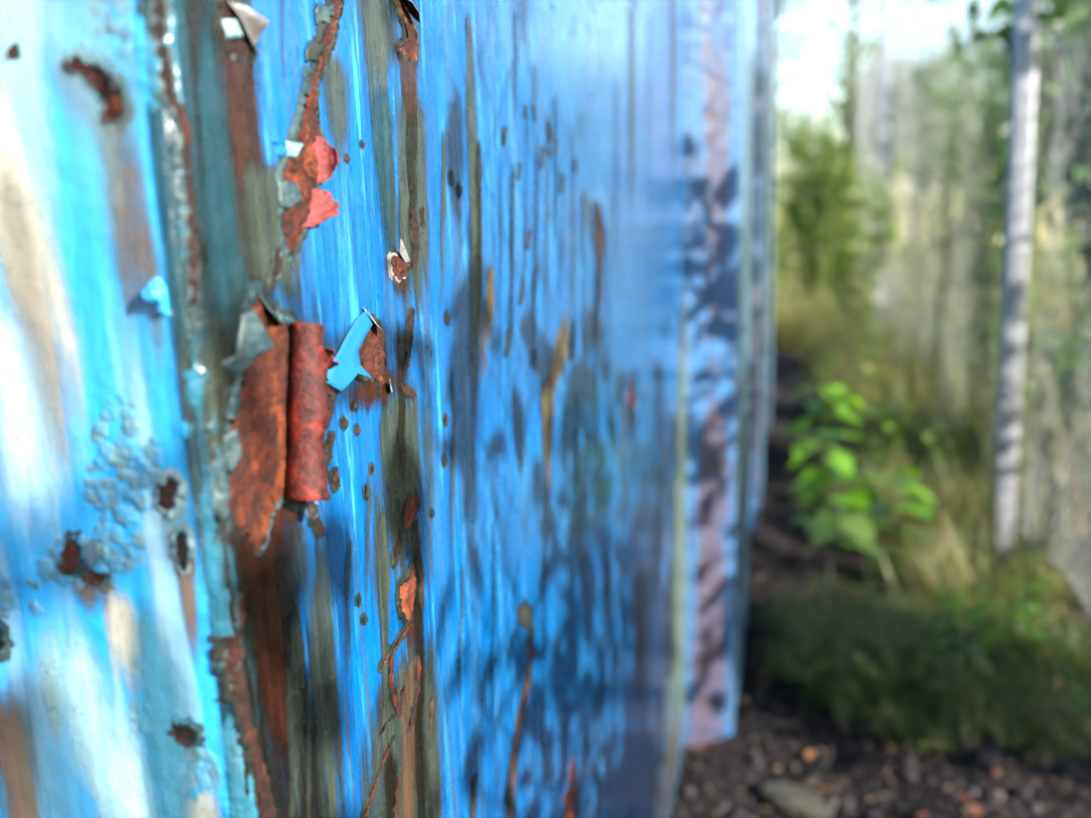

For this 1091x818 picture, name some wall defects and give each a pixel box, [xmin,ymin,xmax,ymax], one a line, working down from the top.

peeling [211,0,270,106]
peeling [275,0,350,262]
peeling [391,0,420,118]
peeling [386,239,411,297]
corrosion [593,200,603,305]
peeling [151,467,198,644]
peeling [210,280,401,585]
corrosion [401,491,419,542]
corrosion [246,550,288,751]
corrosion [395,561,416,818]
corrosion [506,604,535,816]